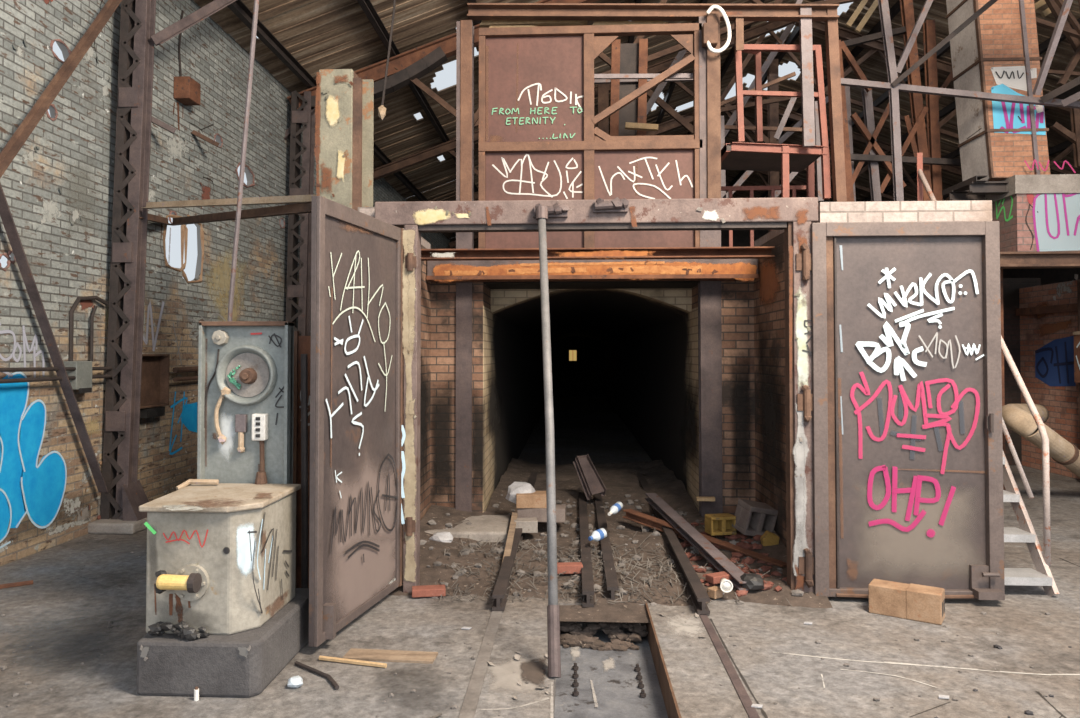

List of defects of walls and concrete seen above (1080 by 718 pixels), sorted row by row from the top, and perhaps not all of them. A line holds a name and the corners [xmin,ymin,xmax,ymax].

peeling [323,88,342,125]
peeling [337,150,348,180]
rust [433,250,757,282]
peeling [794,291,811,386]
peeling [332,206,471,616]
water stain [473,401,485,488]
peeling [793,404,809,576]